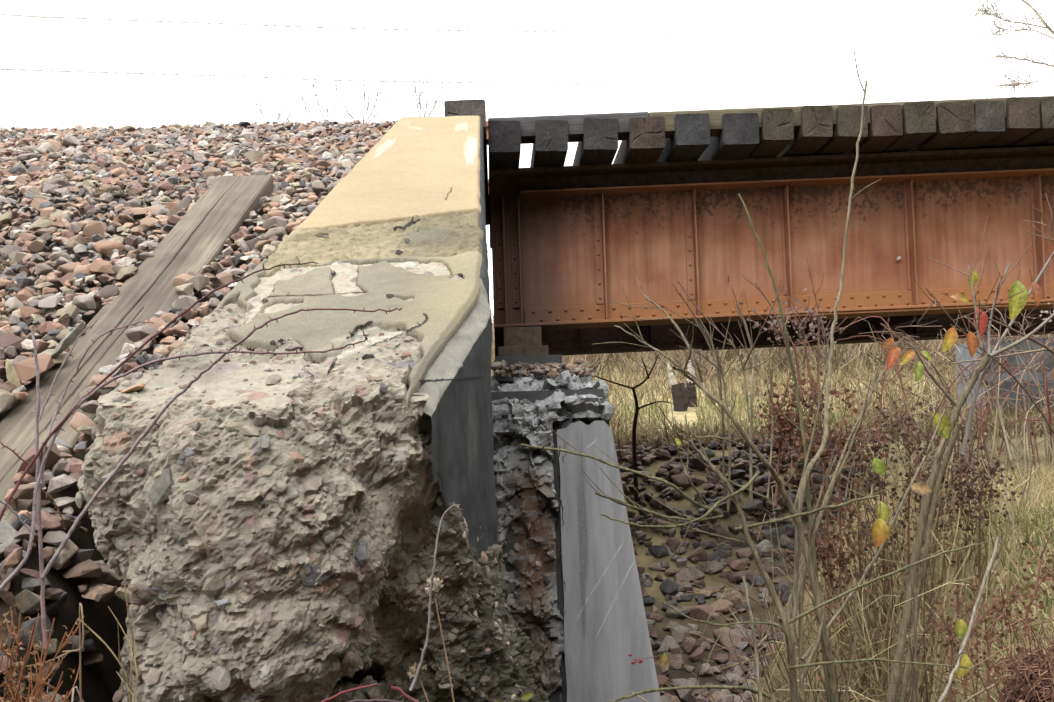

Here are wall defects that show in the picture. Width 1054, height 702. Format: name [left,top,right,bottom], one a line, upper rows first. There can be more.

crack [266,290,366,298]
crack [327,313,428,375]
spalling [75,260,614,702]